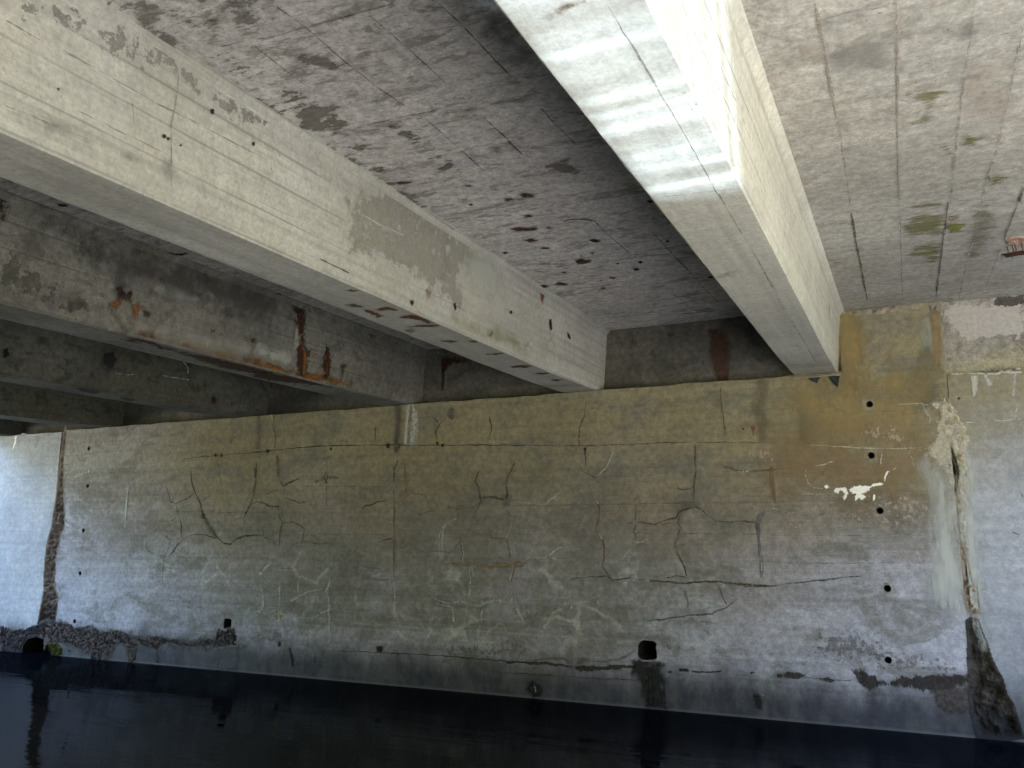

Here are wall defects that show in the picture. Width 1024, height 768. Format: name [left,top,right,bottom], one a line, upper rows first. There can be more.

corrosion [512,215,550,249]
corrosion [94,286,346,388]
corrosion [709,329,729,381]
spalling [37,426,67,626]
crack [146,418,337,584]
crack [473,462,515,598]
crack [570,401,860,621]
peeling [770,481,936,566]
damp [631,659,668,709]